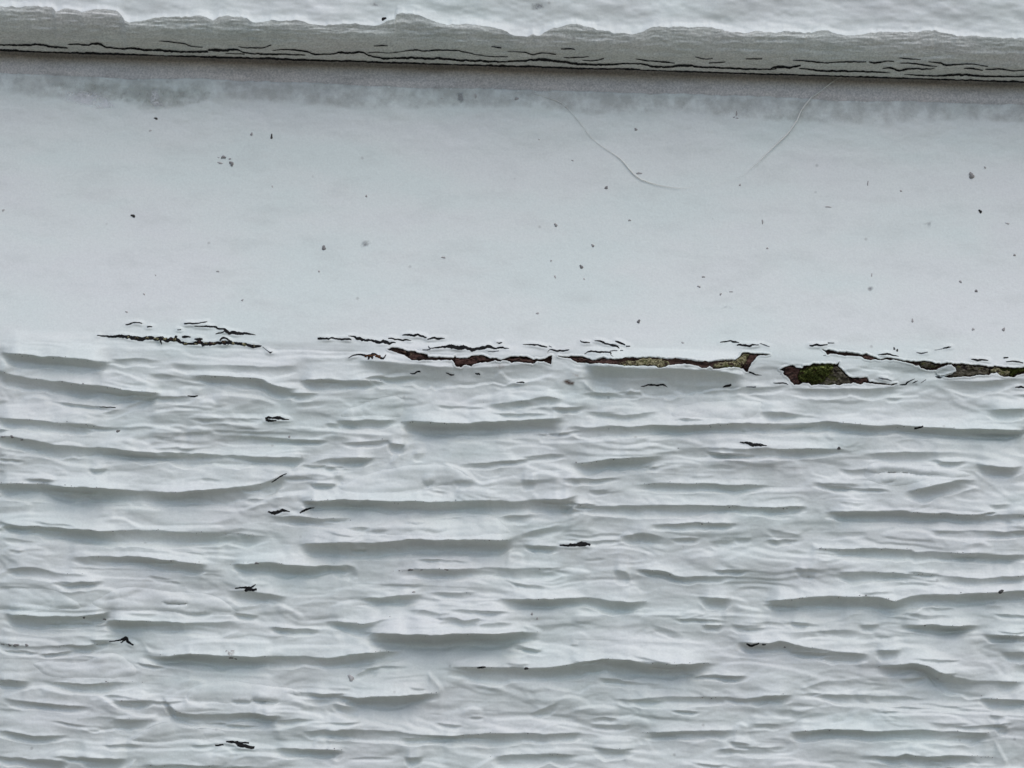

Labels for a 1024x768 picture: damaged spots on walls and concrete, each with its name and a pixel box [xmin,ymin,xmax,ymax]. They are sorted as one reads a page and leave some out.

crack [0,41,1024,78]
peeling [385,345,1024,388]